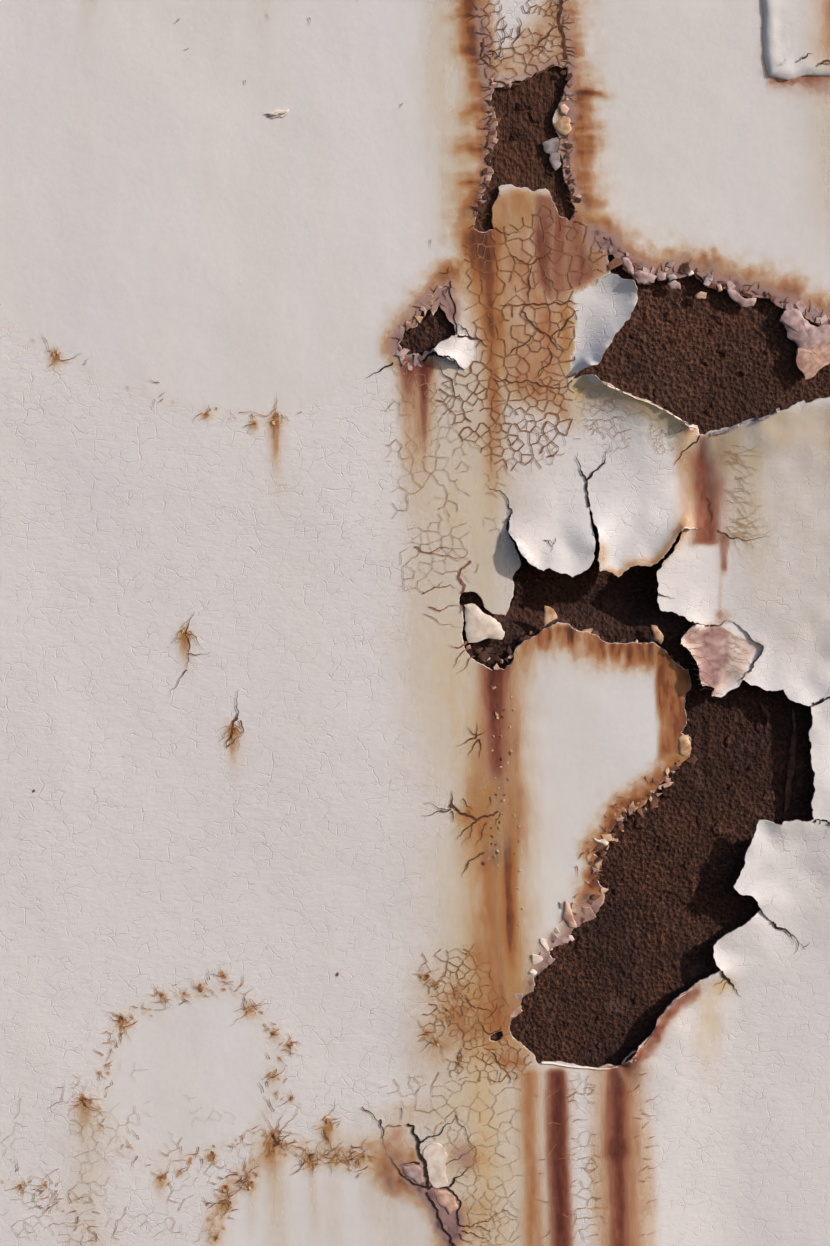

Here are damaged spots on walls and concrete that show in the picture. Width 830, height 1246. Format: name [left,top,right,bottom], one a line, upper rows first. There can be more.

peeling [468,0,586,235]
peeling [366,281,479,378]
corrosion [383,0,830,576]
corrosion [243,395,283,456]
corrosion [167,614,207,694]
corrosion [220,691,244,752]
peeling [459,246,830,1145]
corrosion [416,611,747,1246]
corrosion [69,1094,108,1123]
corrosion [207,1090,370,1241]
crack [381,944,606,1246]
crack [629,1073,660,1236]